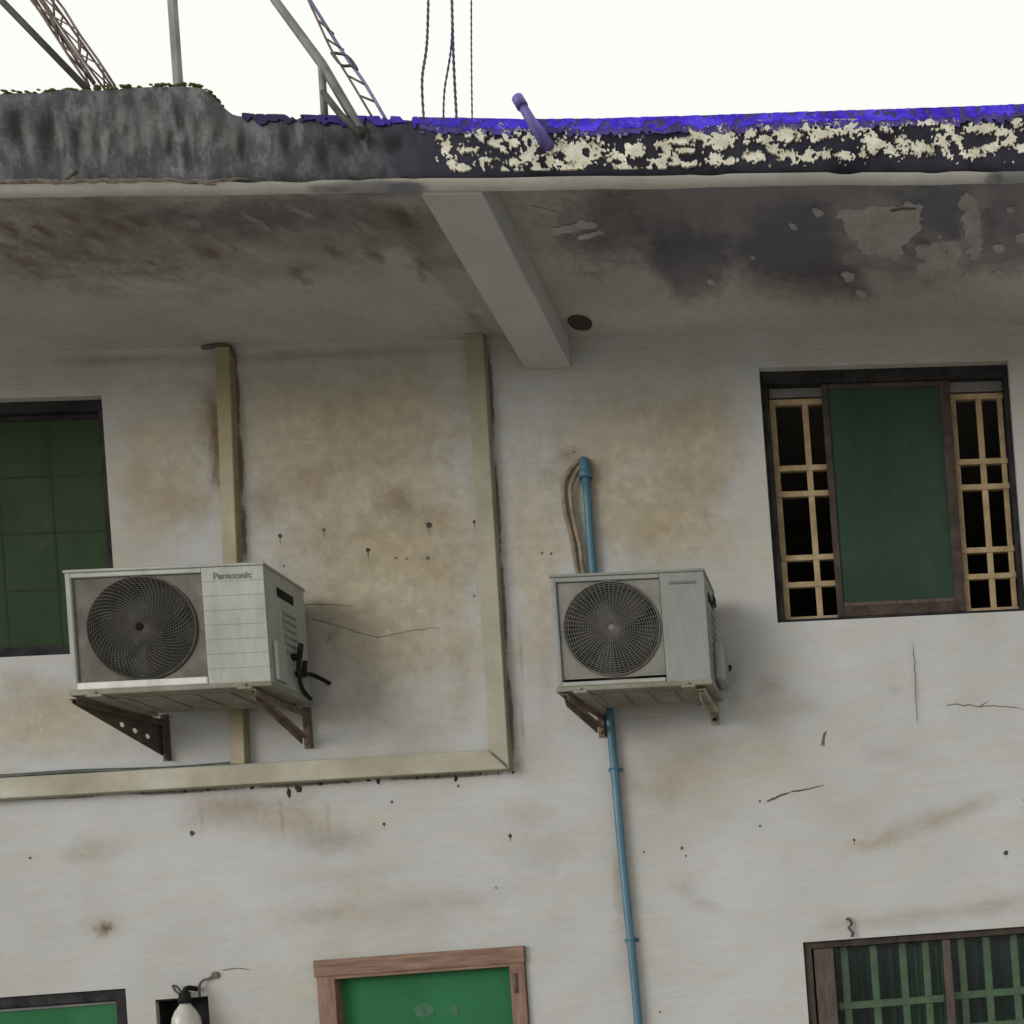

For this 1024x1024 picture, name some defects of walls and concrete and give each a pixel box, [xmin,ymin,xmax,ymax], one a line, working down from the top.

peeling [419,104,1024,173]
peeling [532,206,604,240]
spalling [812,192,1024,282]
crack [305,603,430,642]
crack [911,645,919,712]
crack [946,701,1020,709]
crack [767,785,823,802]